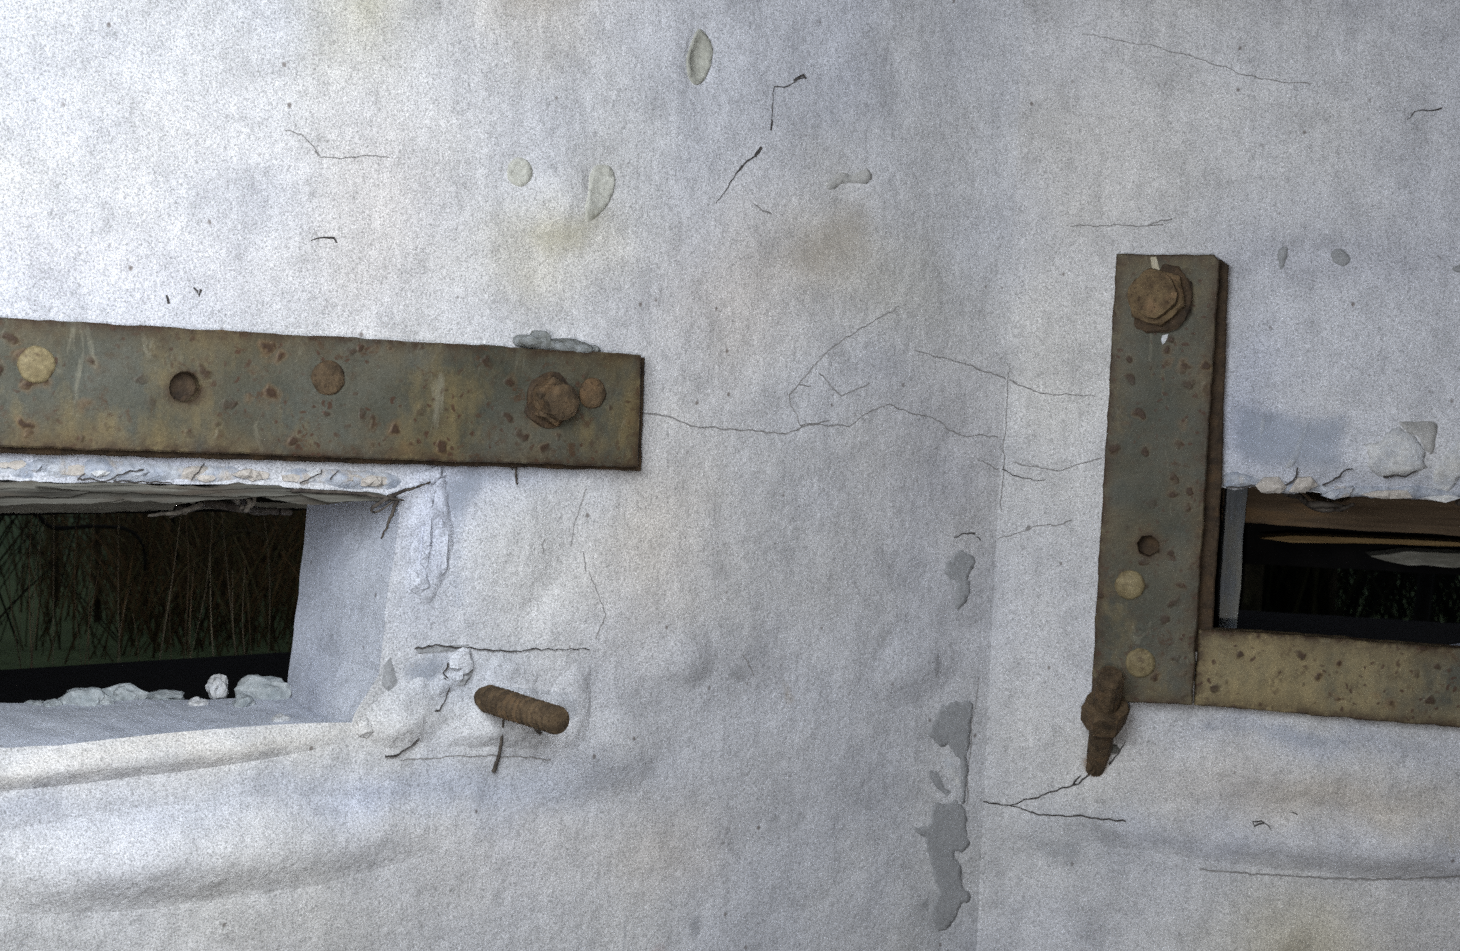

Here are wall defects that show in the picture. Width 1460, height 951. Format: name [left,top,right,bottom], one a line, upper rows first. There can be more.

crack [643,306,1102,541]
spalling [1222,421,1460,503]
peeling [944,550,976,610]
peeling [914,700,973,931]
crack [966,675,1126,822]